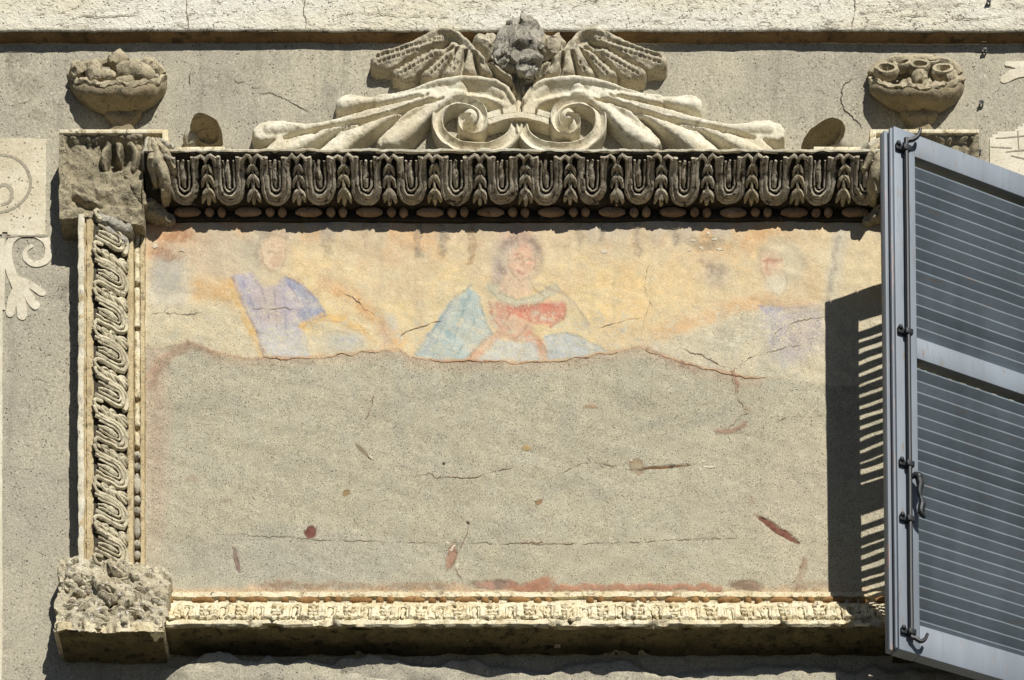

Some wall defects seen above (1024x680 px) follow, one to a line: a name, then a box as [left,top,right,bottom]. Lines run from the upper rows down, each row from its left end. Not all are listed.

crack [837,76,862,128]
peeling [264,348,398,360]
peeling [412,351,618,365]
peeling [645,349,766,379]
crack [683,316,825,433]
spalling [630,458,689,475]
crack [419,468,510,483]
spalling [304,526,316,538]
spalling [758,515,802,543]
spalling [445,542,460,569]
spalling [473,578,518,589]
spalling [730,580,762,591]